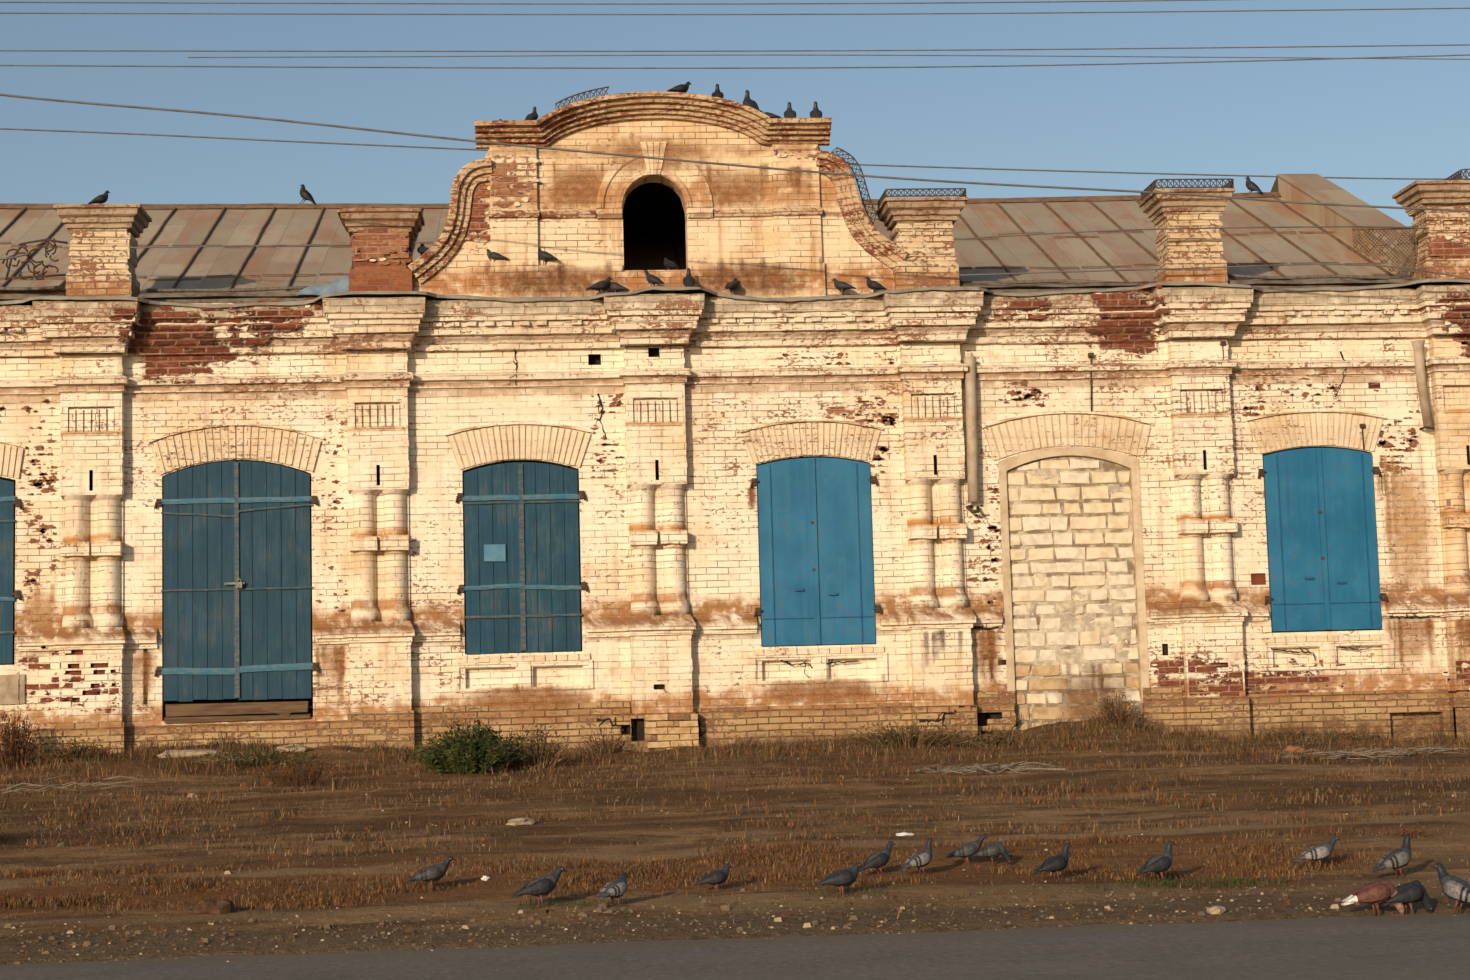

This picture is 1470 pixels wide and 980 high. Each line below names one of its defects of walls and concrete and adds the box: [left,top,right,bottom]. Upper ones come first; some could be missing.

peeling [464,154,539,243]
peeling [108,296,323,384]
peeling [1002,297,1052,320]
peeling [1084,279,1172,358]
peeling [1426,235,1470,358]
peeling [0,399,60,623]
spalling [18,645,123,714]
peeling [1150,651,1346,697]
peeling [1442,660,1470,690]